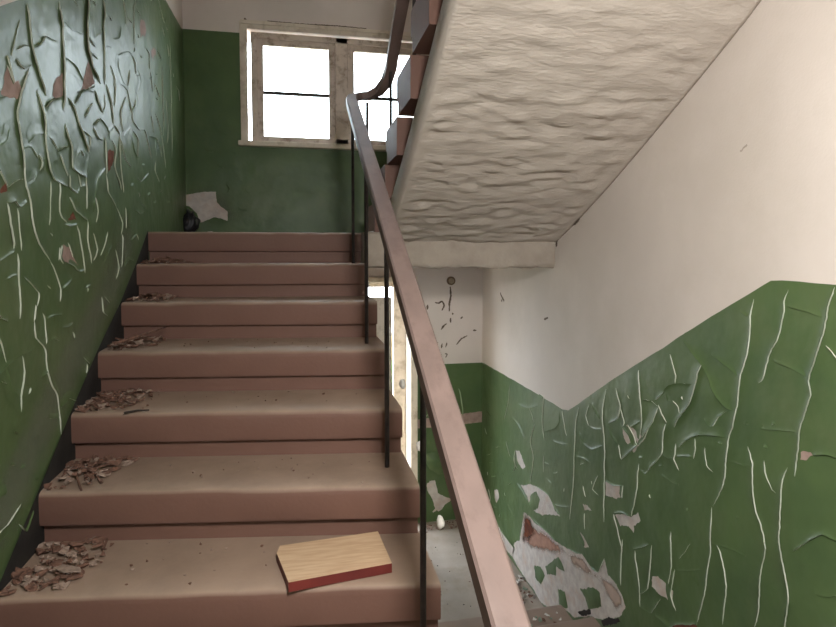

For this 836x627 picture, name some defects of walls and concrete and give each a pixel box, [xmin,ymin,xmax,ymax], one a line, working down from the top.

peeling [1,63,21,99]
peeling [53,73,63,98]
peeling [81,60,95,91]
peeling [60,241,78,265]
peeling [623,425,649,453]
peeling [513,450,525,469]
peeling [426,478,451,512]
peeling [605,476,640,533]
peeling [499,482,628,626]
peeling [652,571,674,600]